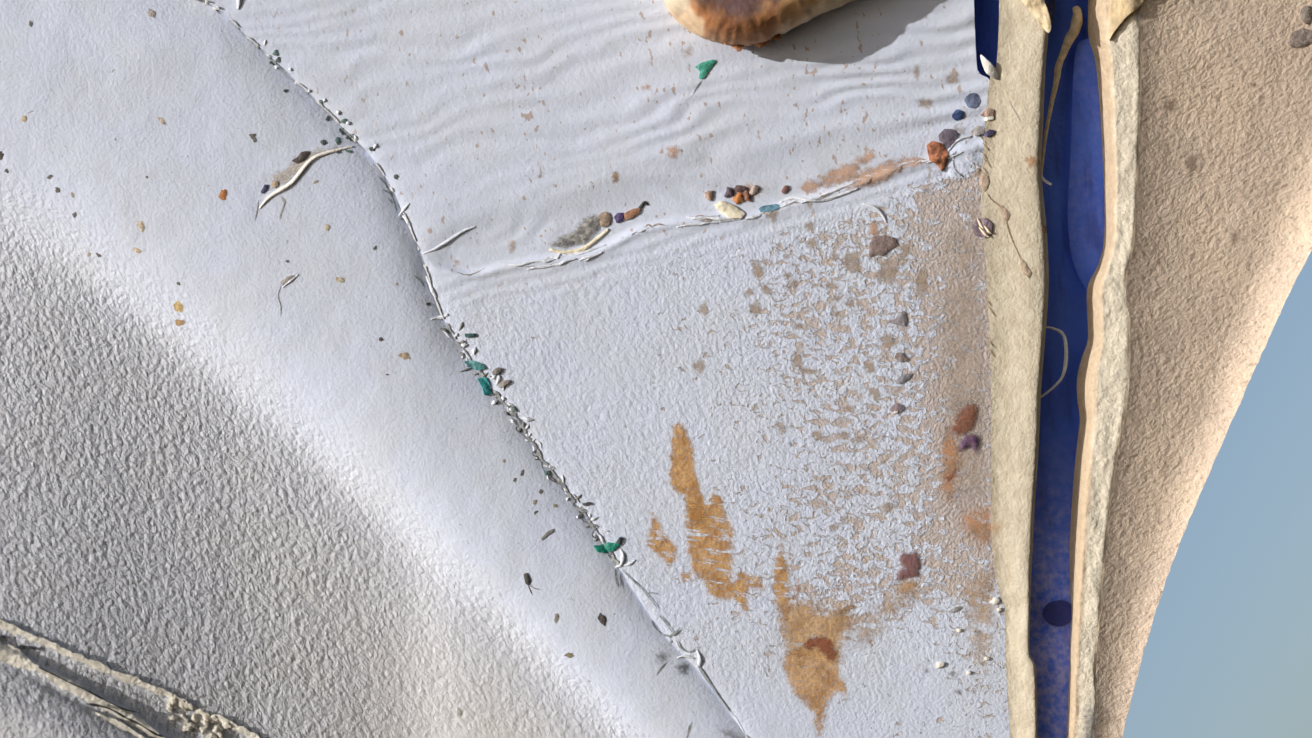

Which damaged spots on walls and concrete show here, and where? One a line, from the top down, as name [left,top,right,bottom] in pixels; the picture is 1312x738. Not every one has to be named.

corrosion [724,33,781,52]
peeling [695,60,716,79]
peeling [255,146,354,219]
peeling [597,212,611,227]
peeling [631,177,872,235]
peeling [508,244,606,270]
peeling [594,535,636,568]
corrosion [648,424,867,730]
peeling [0,619,267,738]